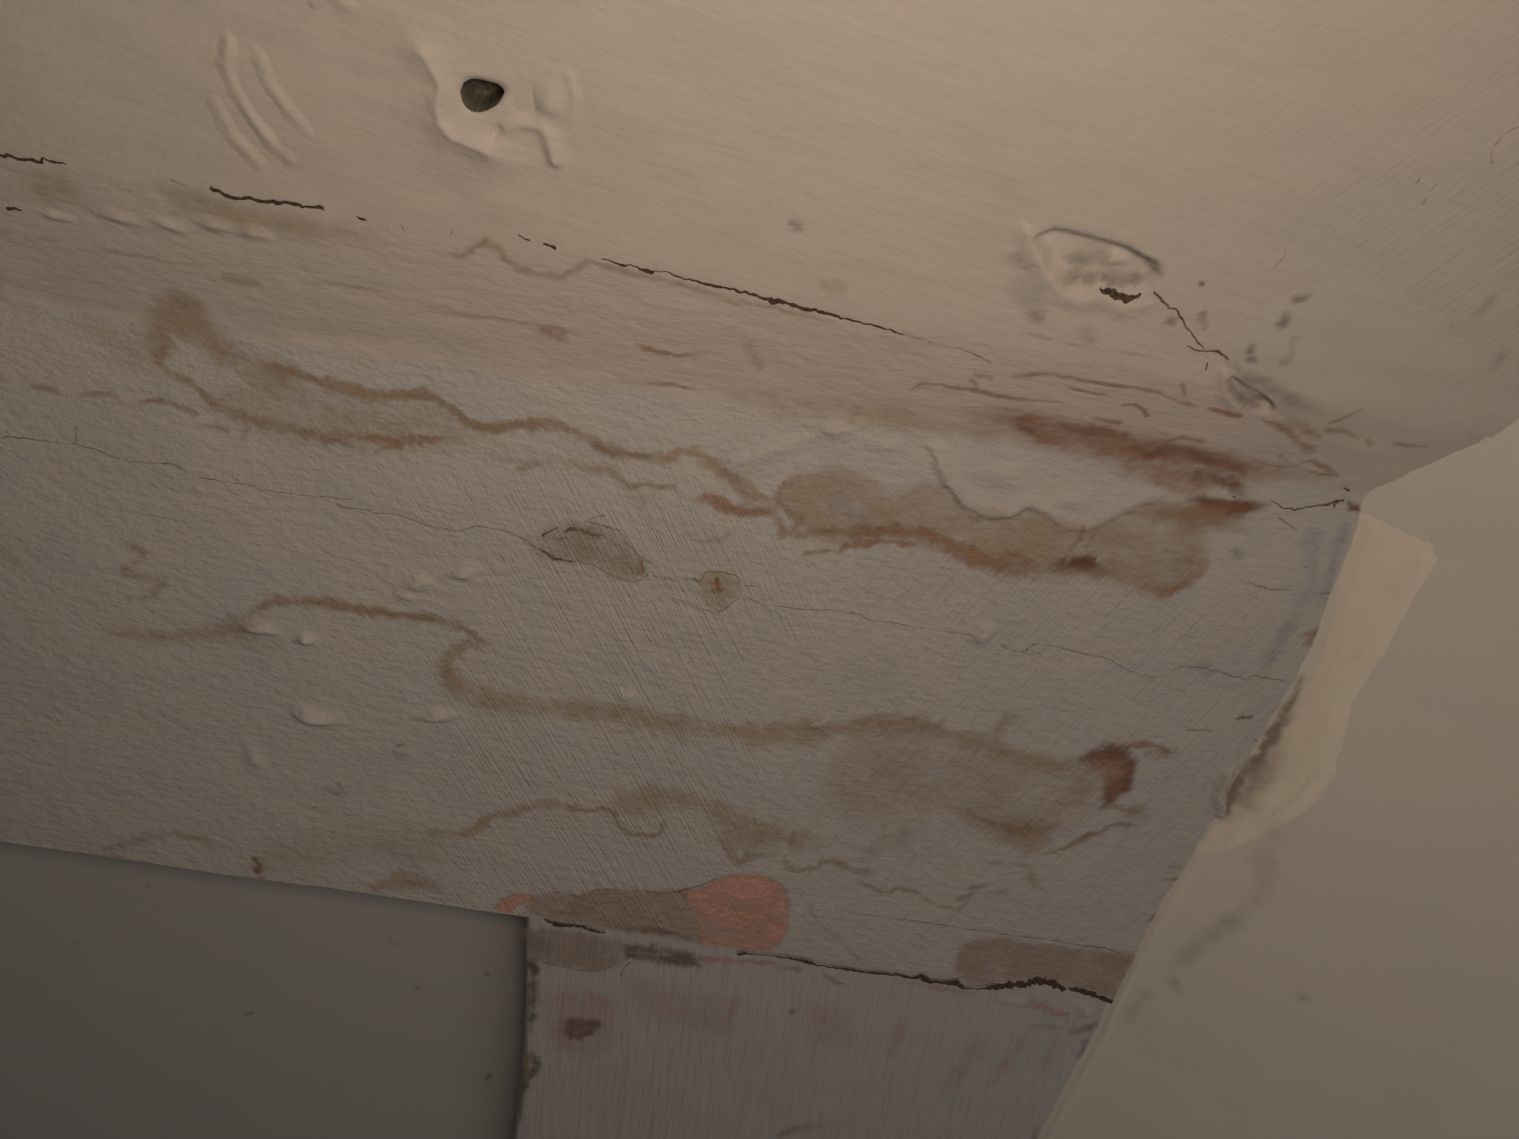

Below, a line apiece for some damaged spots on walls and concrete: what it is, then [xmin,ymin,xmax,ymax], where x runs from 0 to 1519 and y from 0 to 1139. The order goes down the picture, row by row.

crack [0,153,66,165]
crack [170,179,405,232]
crack [602,259,991,364]
crack [1153,291,1229,370]
leakage [275,365,571,434]
leakage [593,443,690,461]
leakage [704,493,771,516]
peeling [538,521,659,583]
leakage [786,477,1190,595]
leakage [304,600,438,622]
peeling [1195,513,1437,856]
crack [737,952,1113,1004]